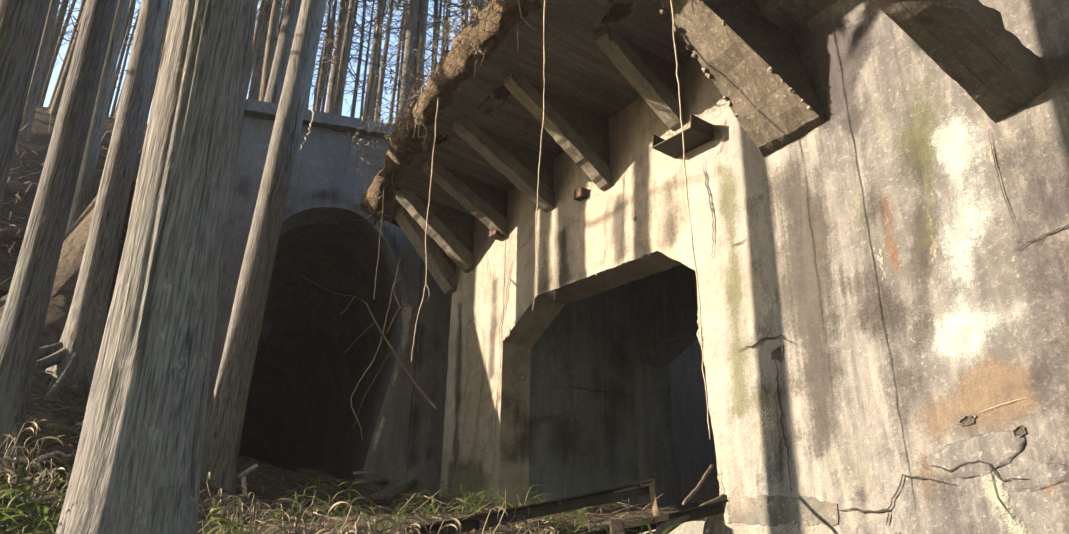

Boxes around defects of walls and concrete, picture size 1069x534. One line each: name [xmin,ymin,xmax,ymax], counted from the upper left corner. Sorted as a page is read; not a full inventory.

damp [791,16,870,132]
crack [988,130,1069,252]
damp [742,114,1027,455]
damp [995,145,1069,426]
crack [738,328,793,491]
damp [752,402,784,484]
crack [840,460,1029,525]